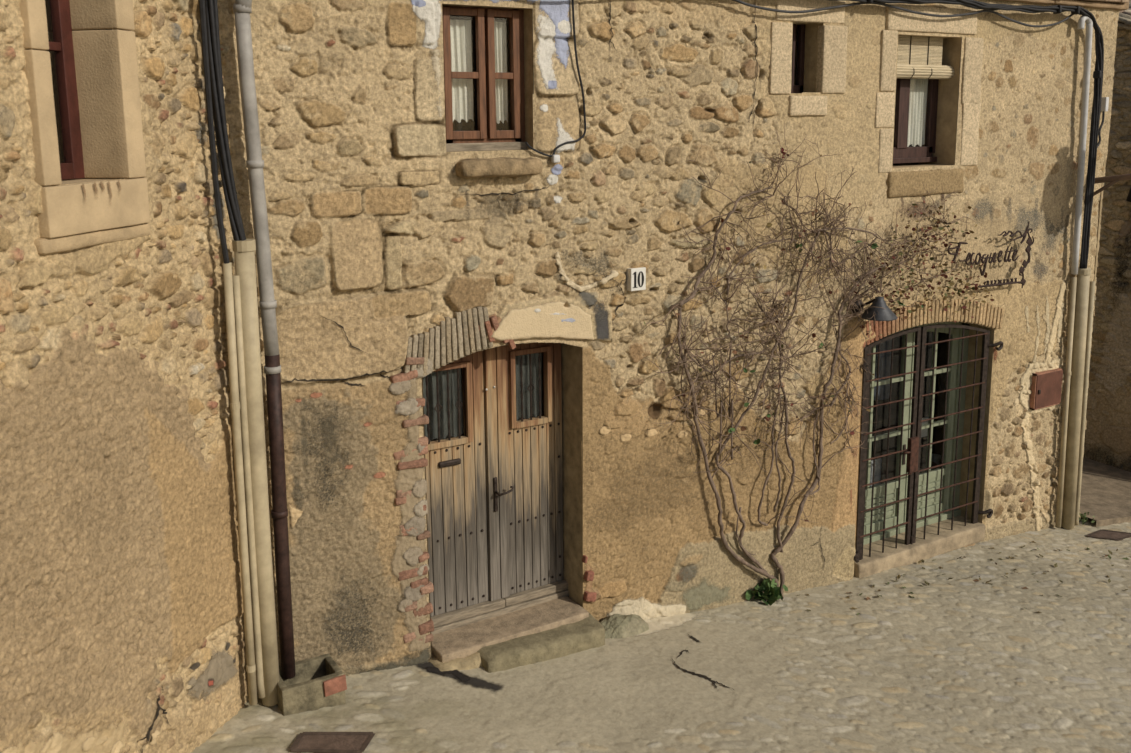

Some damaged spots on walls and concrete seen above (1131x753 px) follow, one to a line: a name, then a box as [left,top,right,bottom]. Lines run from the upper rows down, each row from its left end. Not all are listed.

peeling [411,0,468,117]
peeling [490,0,572,89]
peeling [547,119,575,203]
crack [281,317,404,386]
water stain [294,401,349,508]
crack [137,694,171,753]